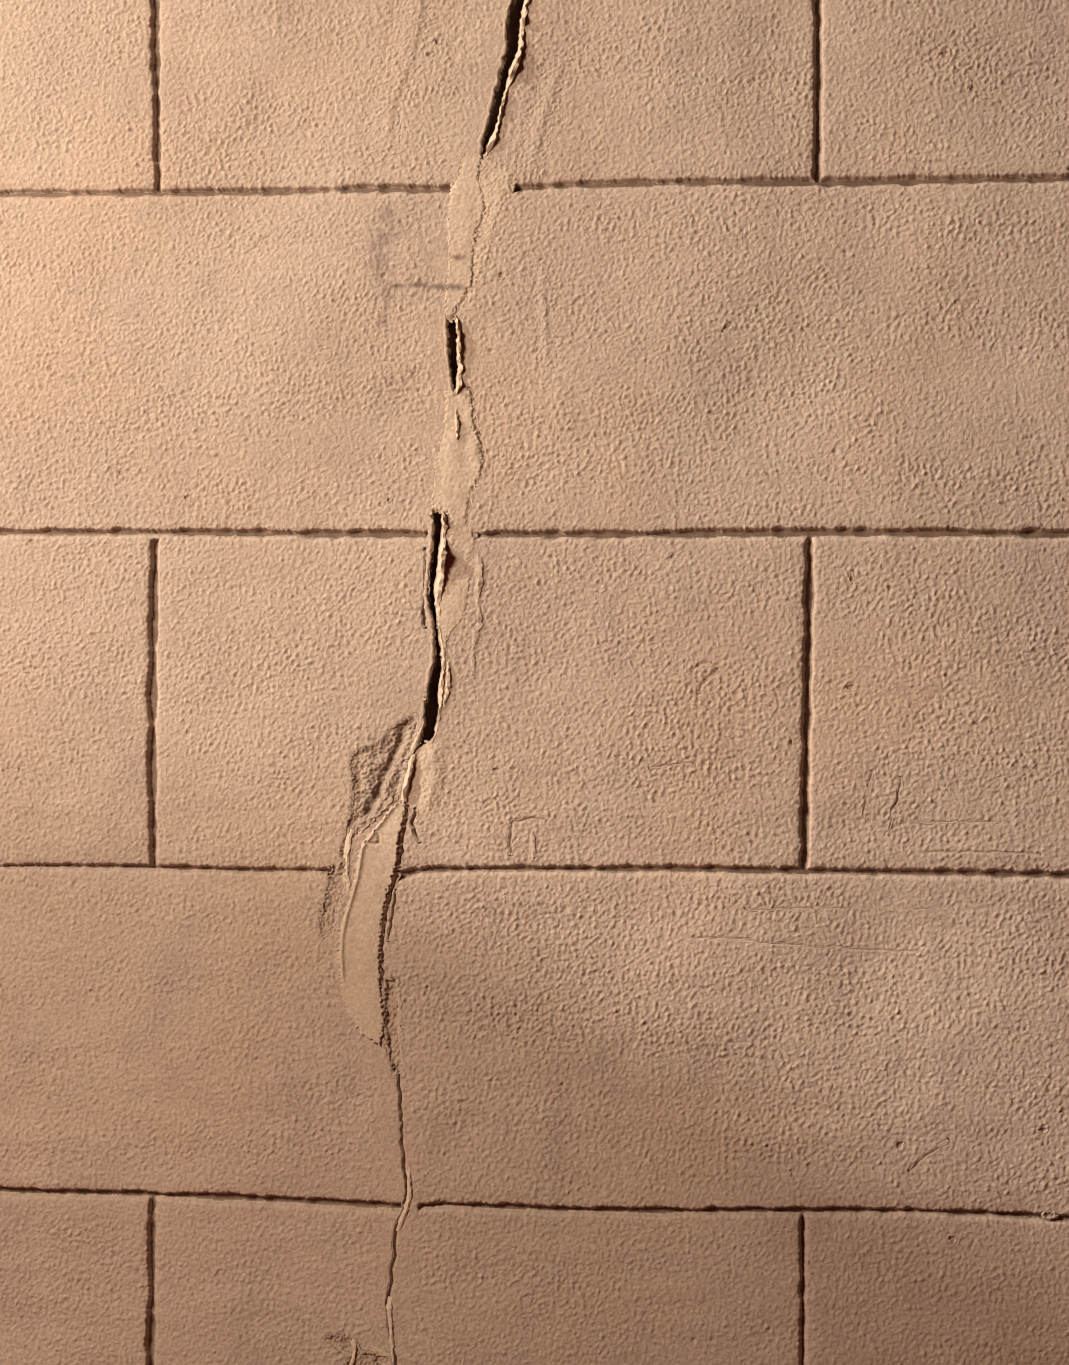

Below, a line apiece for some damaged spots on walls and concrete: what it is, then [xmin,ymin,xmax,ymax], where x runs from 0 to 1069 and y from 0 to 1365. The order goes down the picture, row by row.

crack [379,0,529,984]
crack [343,829,355,893]
spalling [315,711,420,942]
crack [384,1070,413,1365]